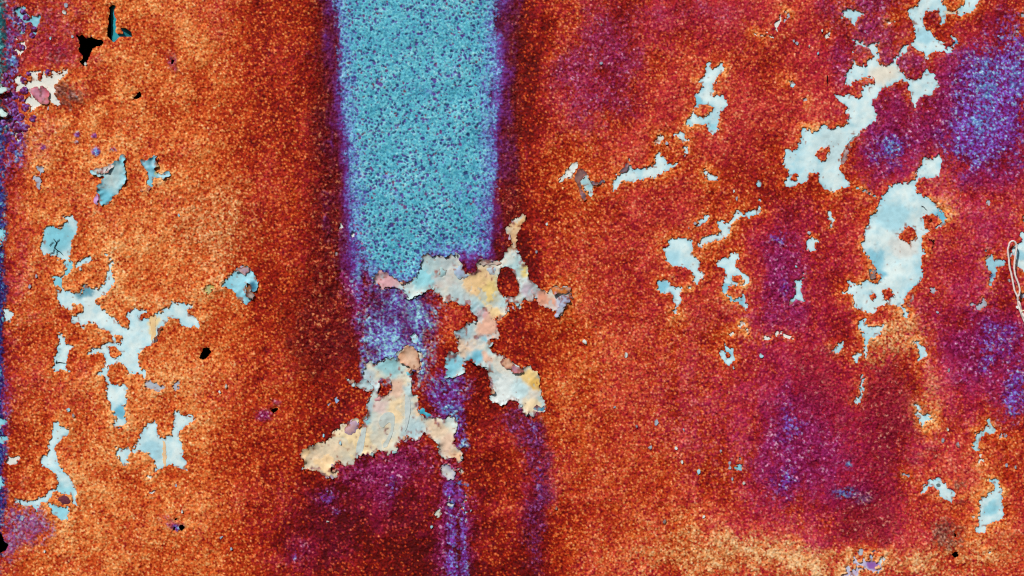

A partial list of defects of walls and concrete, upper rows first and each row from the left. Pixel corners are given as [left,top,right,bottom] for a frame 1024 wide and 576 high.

corrosion [54,81,82,106]
peeling [40,215,200,429]
peeling [115,410,196,494]
corrosion [179,181,262,284]
corrosion [279,0,360,377]
peeling [299,332,464,480]
peeling [372,214,573,417]
corrosion [501,2,522,243]
peeling [558,62,728,201]
peeling [657,180,762,314]
corrosion [641,310,1010,576]
peeling [782,0,981,406]